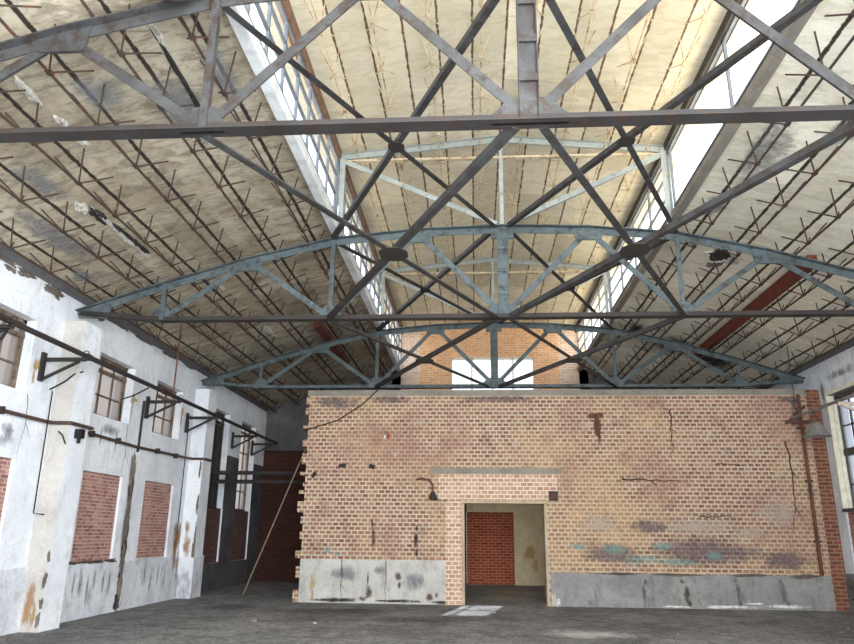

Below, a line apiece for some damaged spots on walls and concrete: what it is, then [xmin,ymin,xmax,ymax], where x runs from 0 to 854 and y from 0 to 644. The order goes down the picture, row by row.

crack [784,441,803,529]
rust [173,524,190,576]
rust [22,586,35,625]